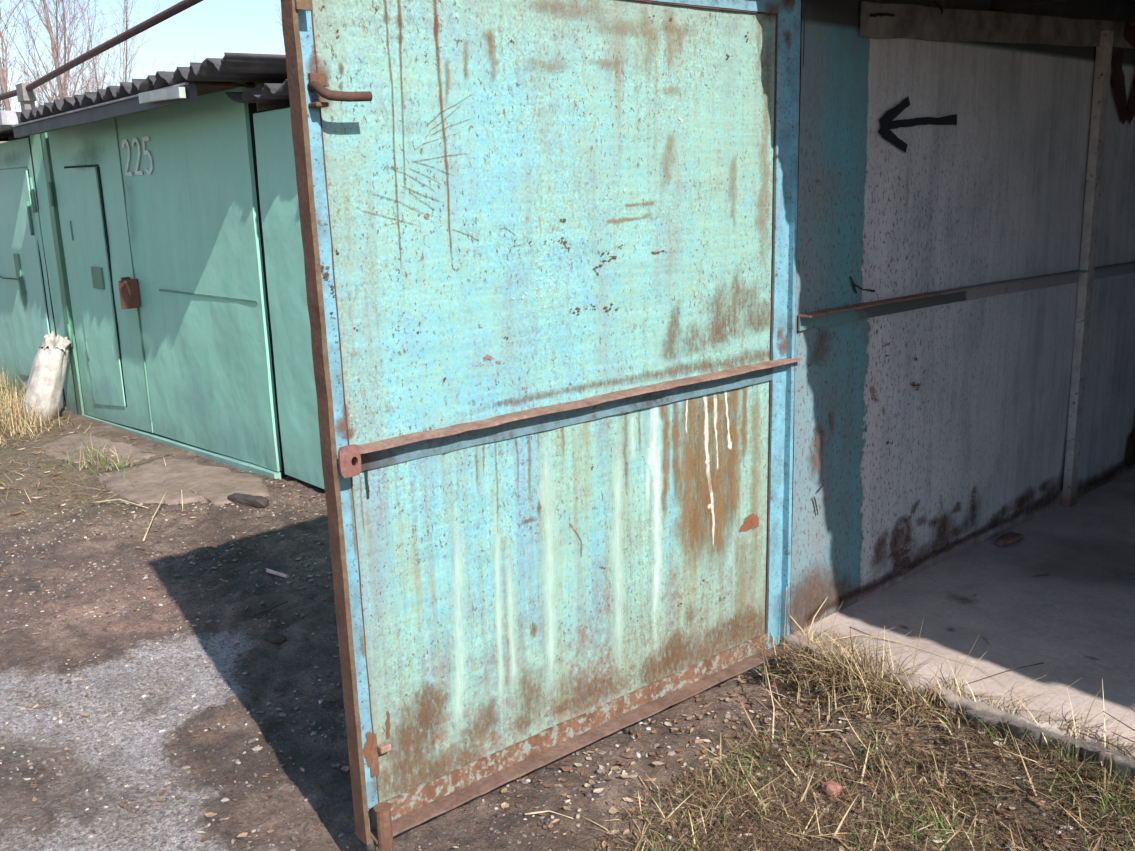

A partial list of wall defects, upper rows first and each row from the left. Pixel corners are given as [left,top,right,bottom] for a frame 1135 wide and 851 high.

corrosion [384,0,405,258]
corrosion [434,0,452,247]
corrosion [567,285,787,391]
corrosion [338,407,354,437]
corrosion [660,386,759,548]
corrosion [813,417,834,469]
corrosion [809,440,1067,618]
corrosion [363,695,476,791]